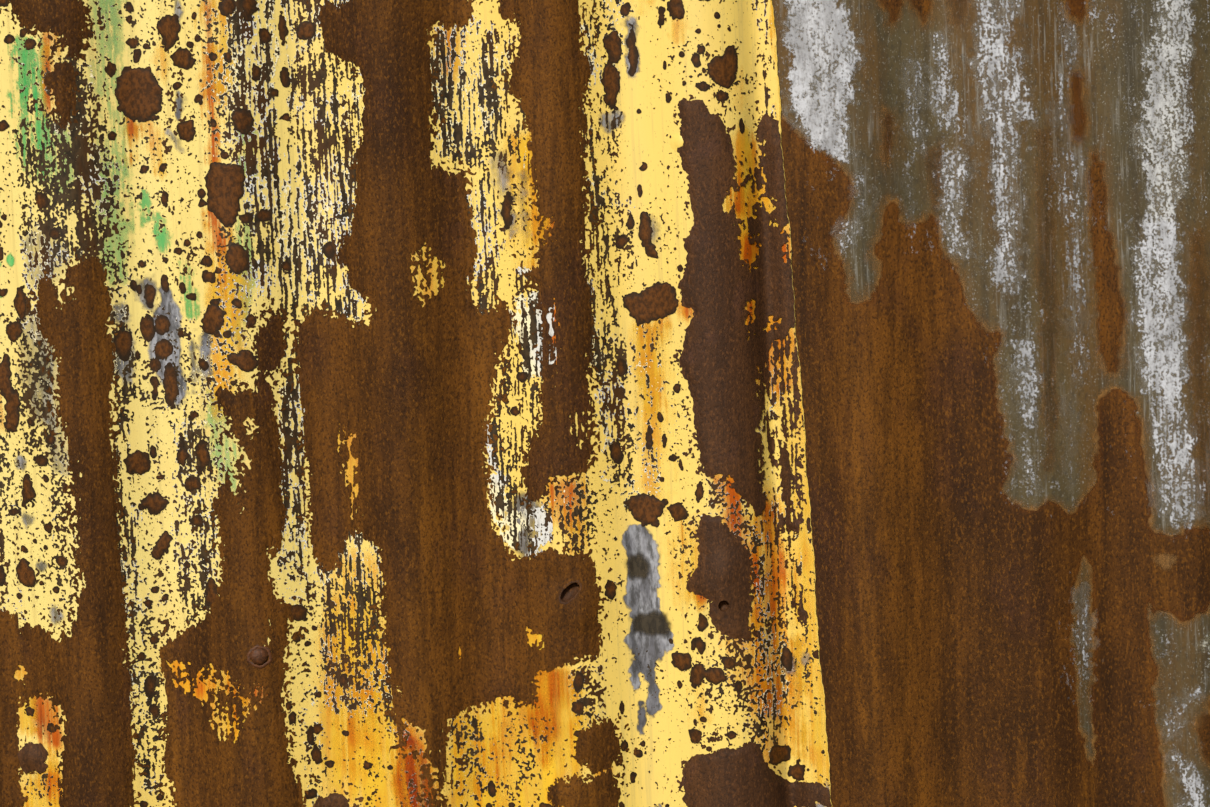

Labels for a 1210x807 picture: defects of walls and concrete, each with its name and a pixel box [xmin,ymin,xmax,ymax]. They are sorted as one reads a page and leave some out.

peeling [0,0,429,807]
rust [0,0,670,807]
peeling [430,0,826,807]
rust [613,45,1210,807]